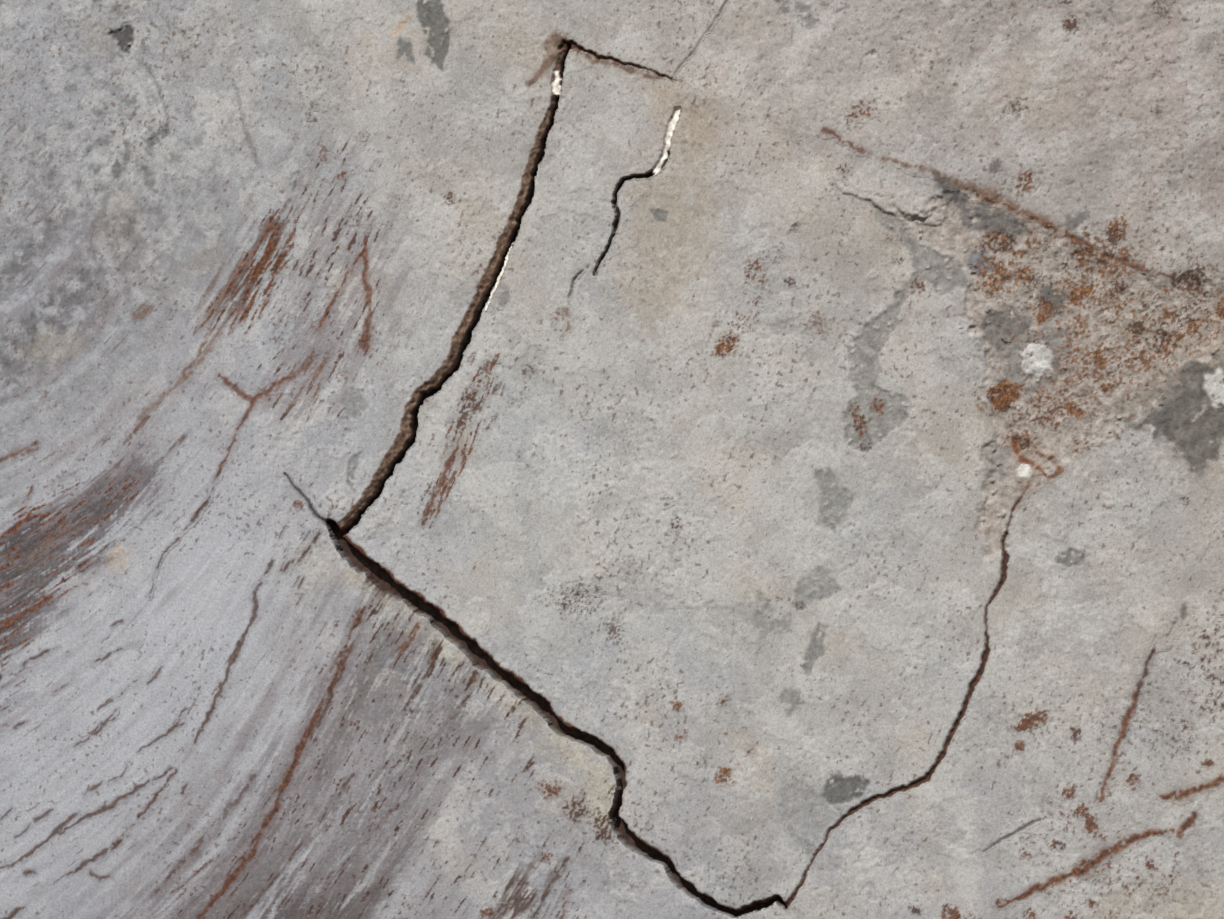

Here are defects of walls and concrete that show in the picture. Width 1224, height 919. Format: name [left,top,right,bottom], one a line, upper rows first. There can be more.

rust [443,190,454,204]
rust [0,100,413,732]
rust [382,348,538,575]
crack [282,0,1030,918]
peeling [841,179,1224,560]
rust [0,499,619,919]
rust [908,905,923,916]
crack [980,817,1042,854]
rust [939,585,1224,919]